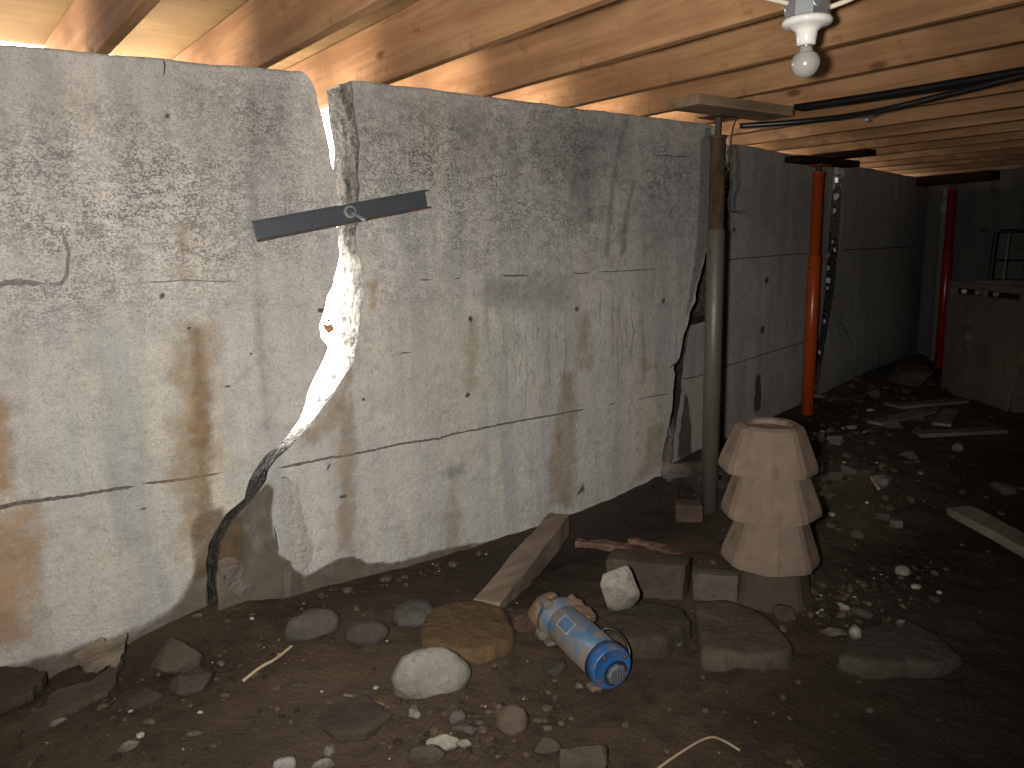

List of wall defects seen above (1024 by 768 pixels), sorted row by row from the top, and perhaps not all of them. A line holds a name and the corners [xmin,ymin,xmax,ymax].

crack [0,232,71,298]
crack [143,277,235,285]
crack [575,267,653,275]
crack [641,144,925,462]
crack [206,80,584,608]
rust [189,332,208,448]
crack [0,472,223,510]